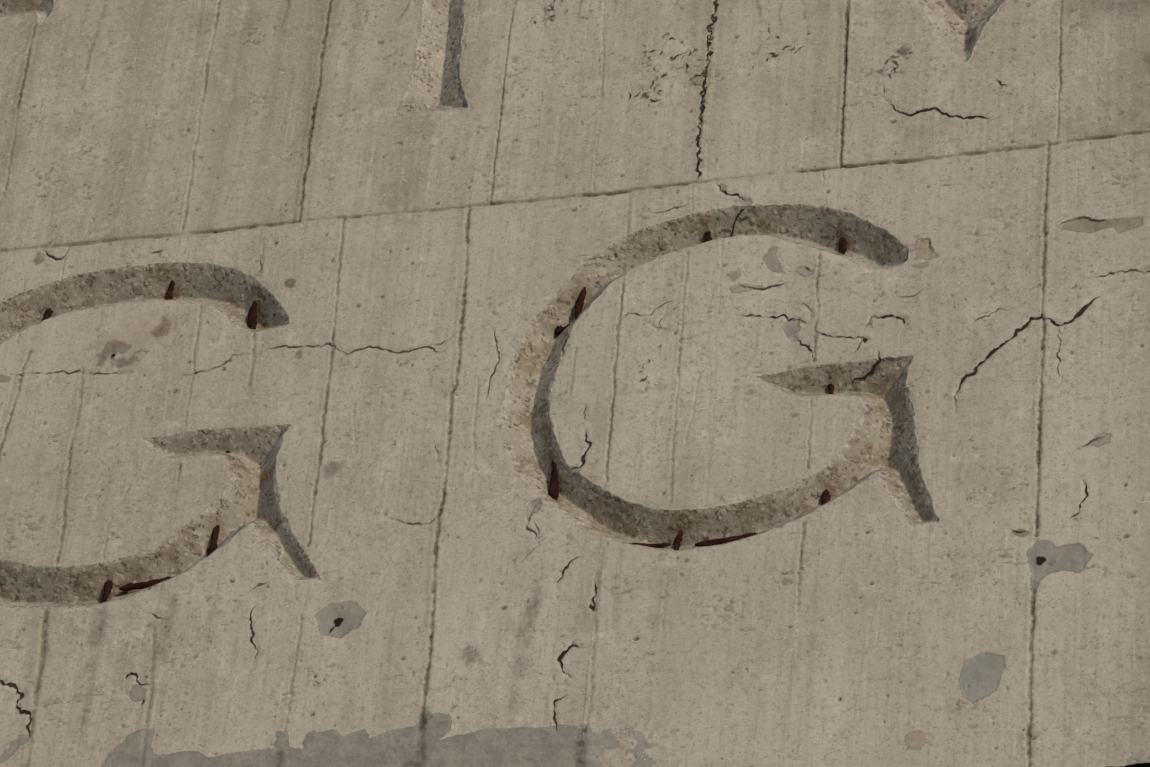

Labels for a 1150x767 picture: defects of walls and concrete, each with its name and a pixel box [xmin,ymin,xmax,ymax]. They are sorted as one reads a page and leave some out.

crack [884,86,988,119]
rust [838,237,847,255]
rust [165,280,175,300]
rust [248,300,258,330]
rust [555,287,586,336]
crack [954,269,1150,412]
rust [548,460,559,500]
rust [821,489,831,505]
rust [207,525,220,556]
rust [630,530,758,551]
rust [100,576,172,603]
crack [0,680,32,737]